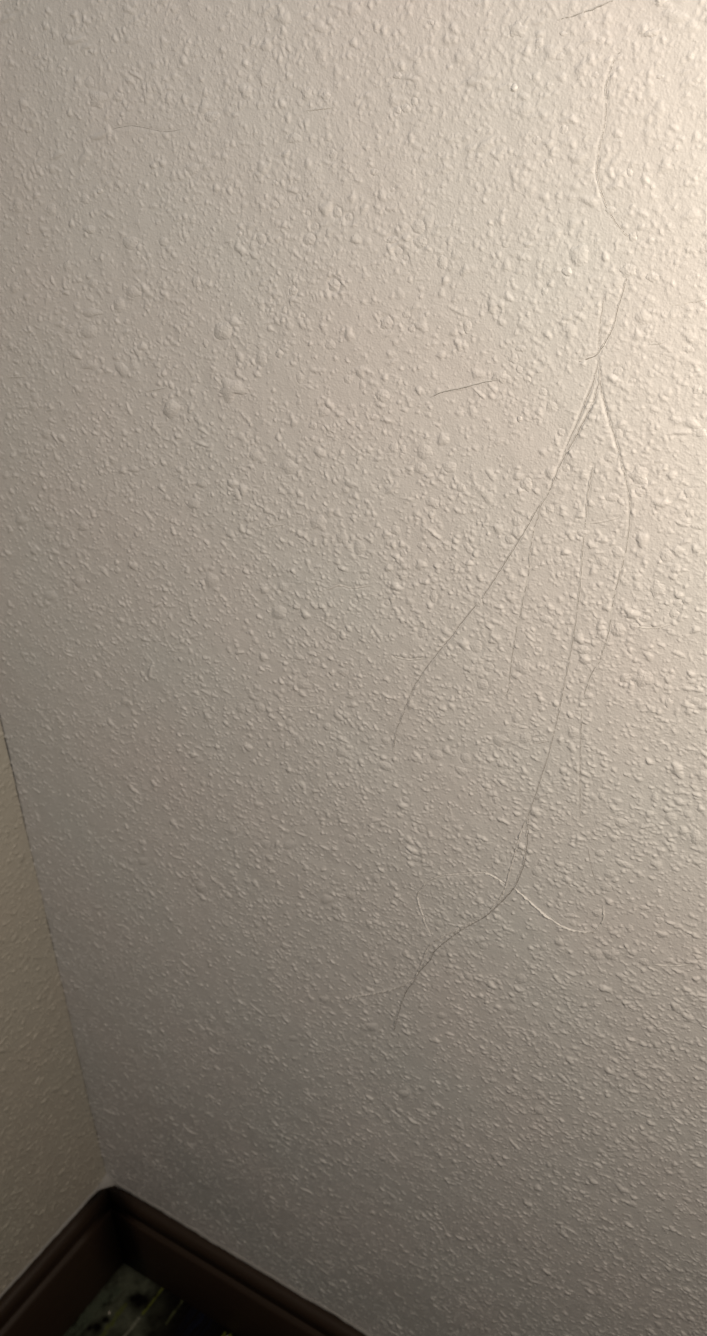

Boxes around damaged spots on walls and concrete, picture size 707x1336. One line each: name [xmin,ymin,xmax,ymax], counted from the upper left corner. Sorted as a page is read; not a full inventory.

crack [596,52,634,243]
crack [348,278,631,1030]